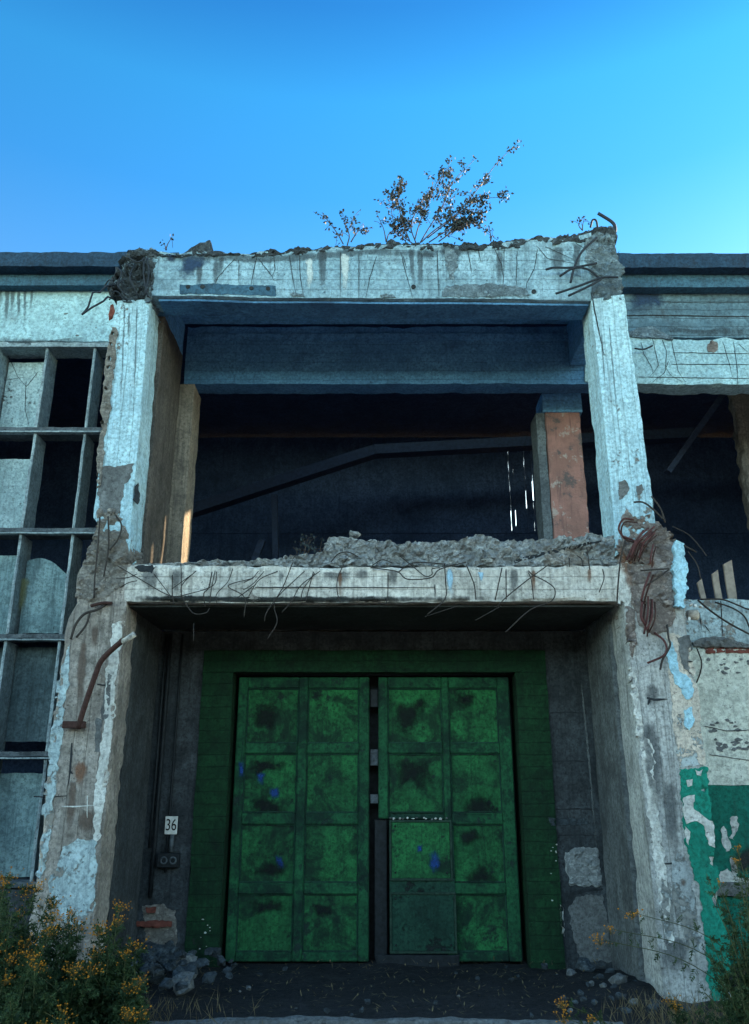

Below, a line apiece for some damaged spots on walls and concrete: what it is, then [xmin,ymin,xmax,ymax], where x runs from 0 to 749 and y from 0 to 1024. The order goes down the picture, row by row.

spalling [81,249,155,315]
leakage [167,254,204,274]
leakage [341,254,349,281]
spalling [545,212,620,297]
crack [626,302,749,389]
peeling [35,327,320,926]
spalling [371,556,477,617]
peeling [476,479,749,1001]